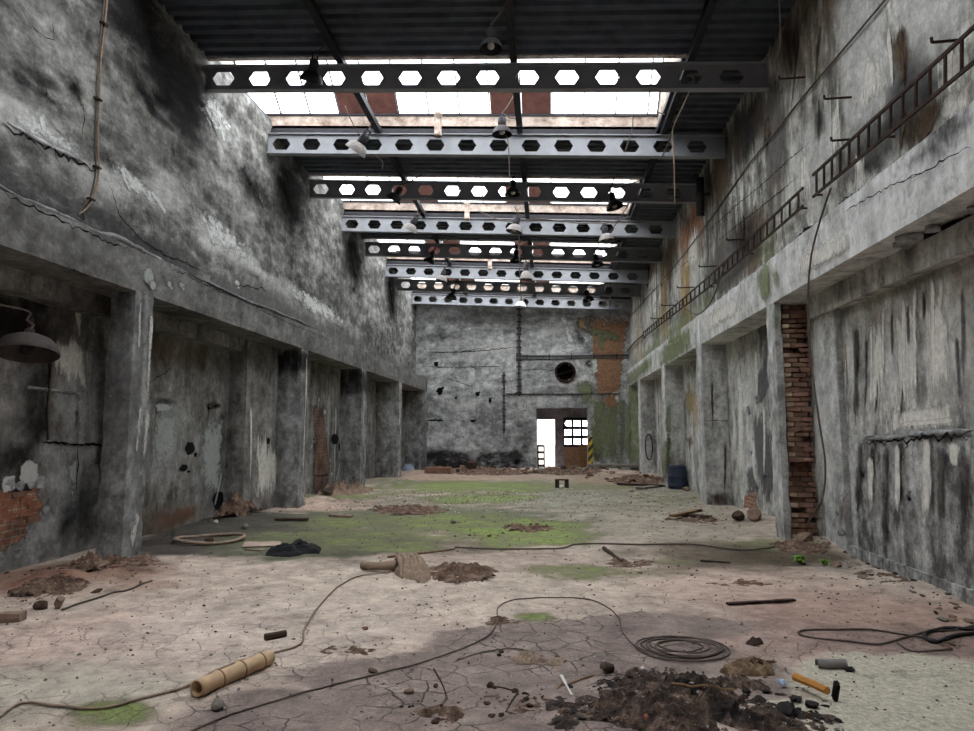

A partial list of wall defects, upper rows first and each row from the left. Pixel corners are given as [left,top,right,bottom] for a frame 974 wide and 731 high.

water stain [147,102,174,131]
water stain [187,86,232,142]
crack [3,107,329,340]
crack [839,147,970,212]
spalling [586,304,630,412]
water stain [865,275,968,542]
spalling [0,476,50,566]
crack [43,437,101,489]
water stain [856,443,900,533]